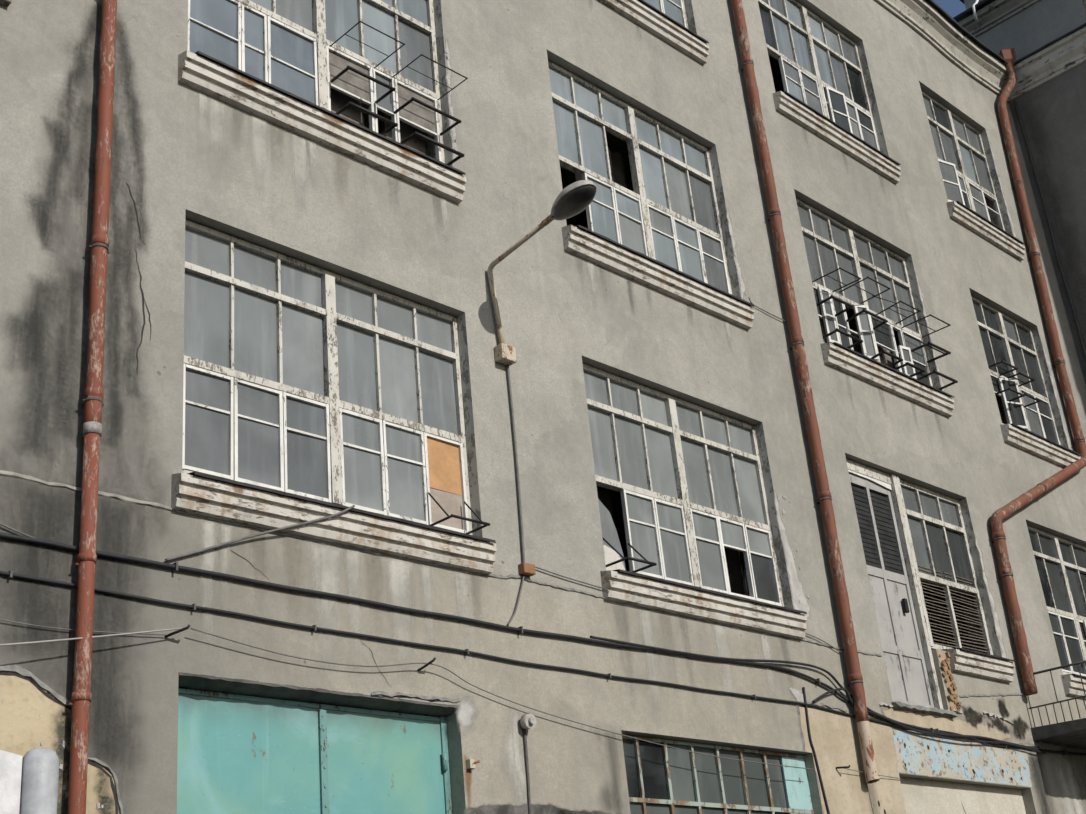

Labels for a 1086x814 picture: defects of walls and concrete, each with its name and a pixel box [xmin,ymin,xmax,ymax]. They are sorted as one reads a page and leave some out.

leakage [0,12,100,694]
leakage [89,32,145,767]
crack [126,182,151,374]
flaking render [0,664,72,814]
flaking render [86,757,124,814]
flaking render [464,804,606,814]
flaking render [789,650,1035,814]